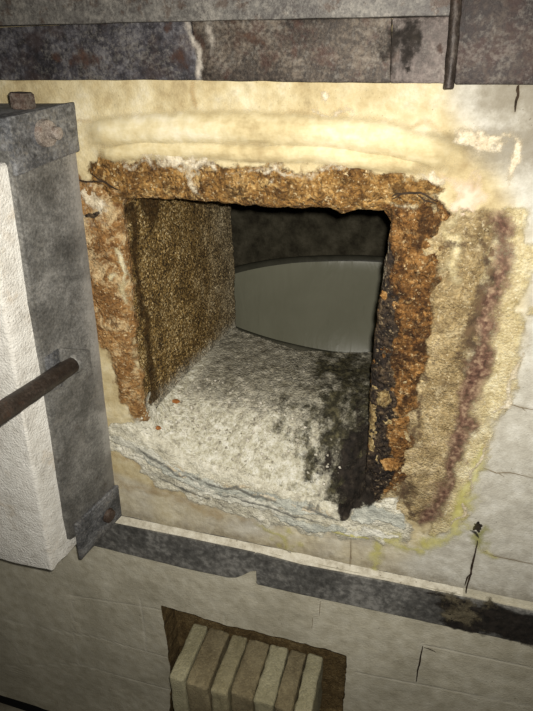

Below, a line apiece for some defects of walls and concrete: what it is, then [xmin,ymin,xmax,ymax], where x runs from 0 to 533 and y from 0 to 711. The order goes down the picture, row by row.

spalling [78,153,533,546]
damp [272,351,375,521]
crack [464,541,530,593]
crack [416,646,435,682]